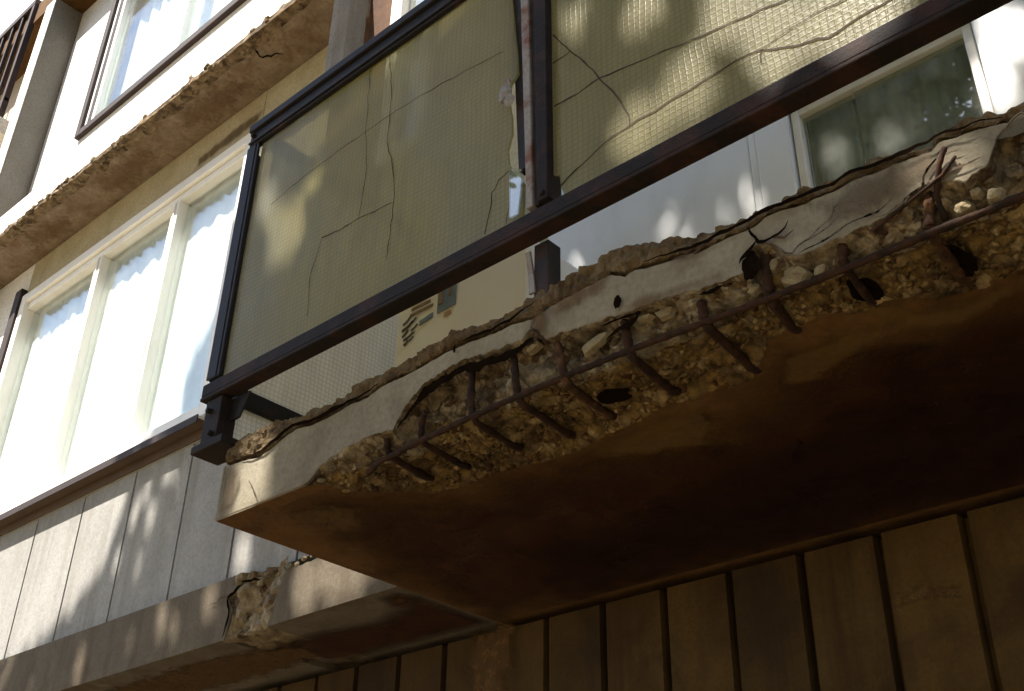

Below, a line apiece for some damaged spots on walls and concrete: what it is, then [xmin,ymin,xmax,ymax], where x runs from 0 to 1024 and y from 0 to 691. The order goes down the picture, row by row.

spalling [0,0,311,251]
spalling [304,113,1024,495]
crack [643,117,1002,302]
crack [210,577,260,638]
spalling [222,555,314,651]
water stain [115,290,1024,691]